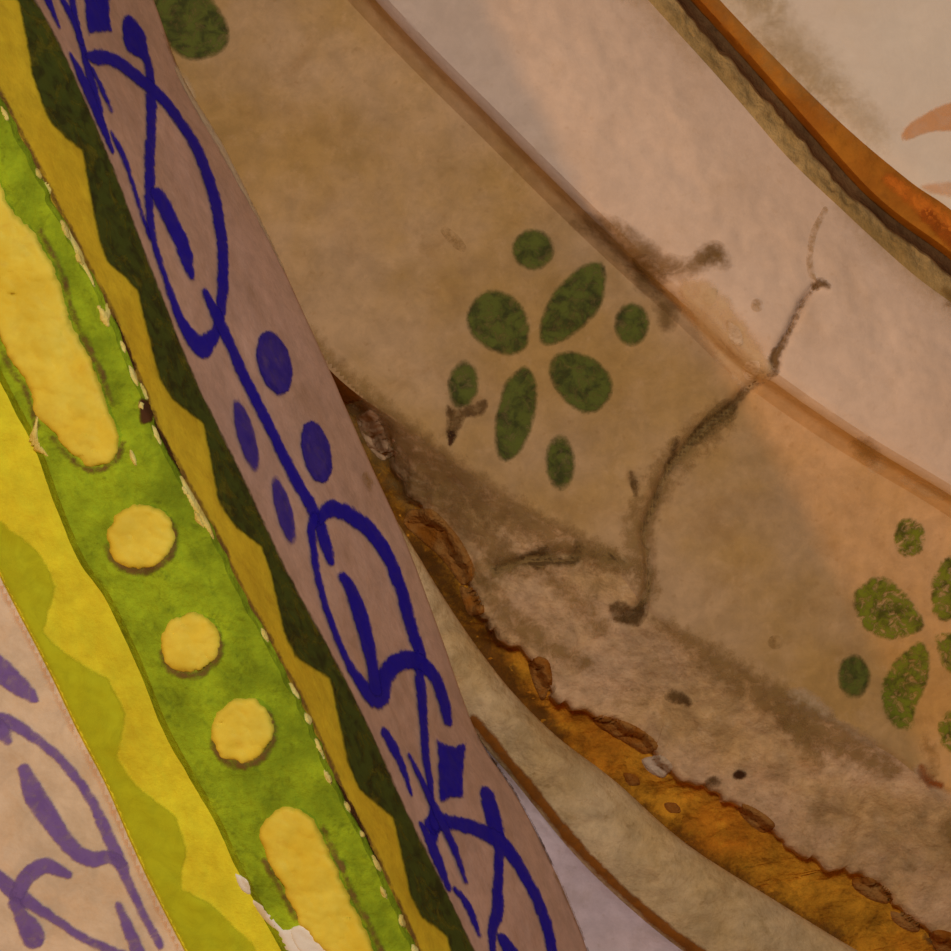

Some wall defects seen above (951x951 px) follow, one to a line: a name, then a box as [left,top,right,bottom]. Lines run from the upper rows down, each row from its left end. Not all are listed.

damp [587,219,722,289]
crack [474,280,829,626]